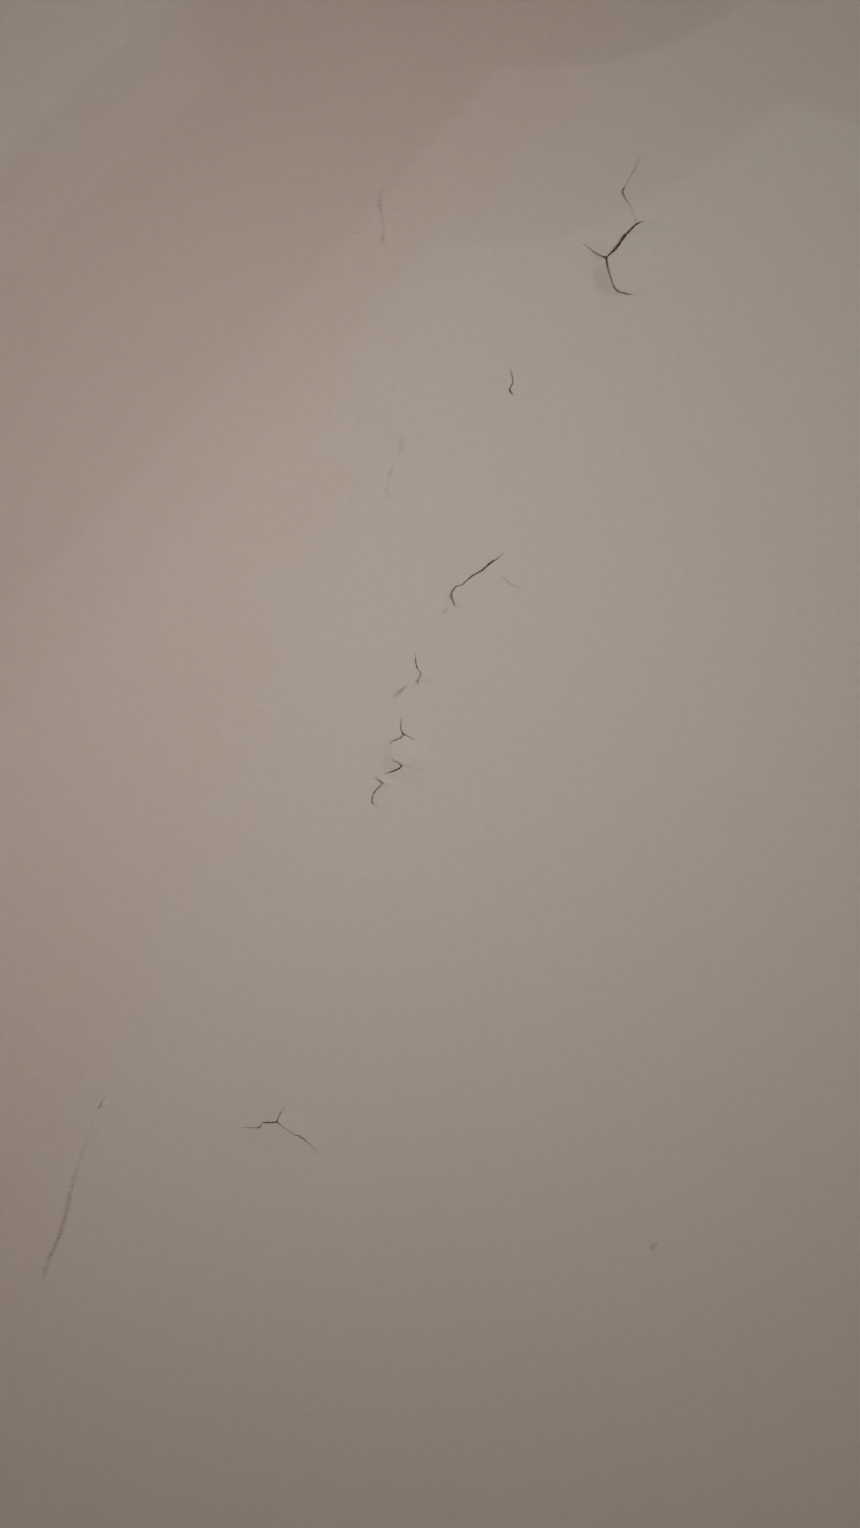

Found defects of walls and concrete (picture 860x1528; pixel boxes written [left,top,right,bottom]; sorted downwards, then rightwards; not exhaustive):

crack [439,546,523,617]
crack [390,652,436,700]